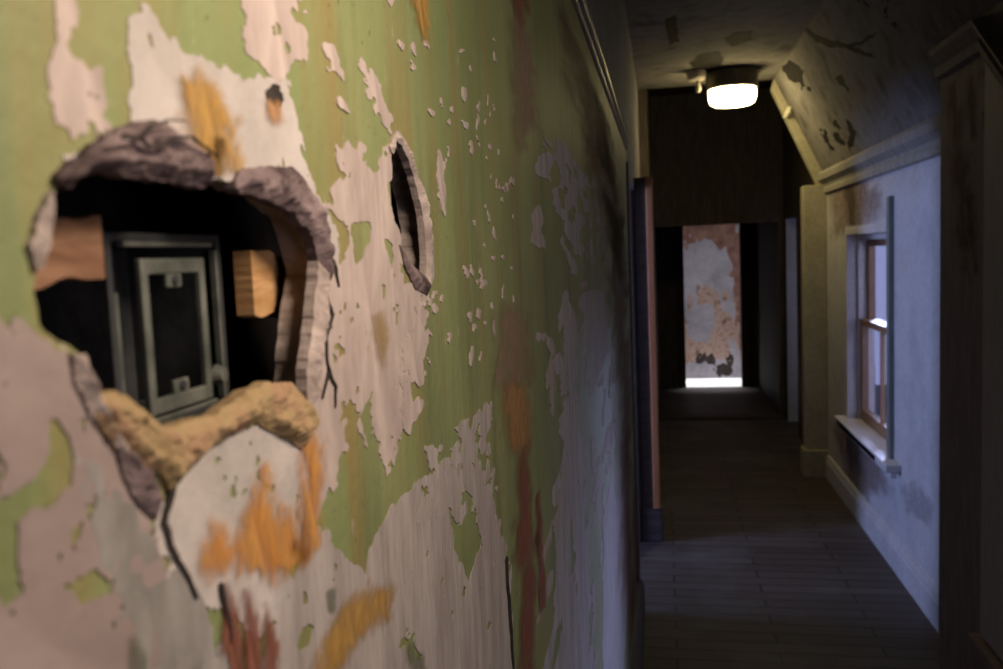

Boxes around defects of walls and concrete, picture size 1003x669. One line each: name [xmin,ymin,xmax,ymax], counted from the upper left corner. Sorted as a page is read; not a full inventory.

peeling [782,60,811,92]
peeling [819,119,856,152]
flaking render [0,0,515,669]
peeling [683,224,741,377]
crack [160,484,233,645]